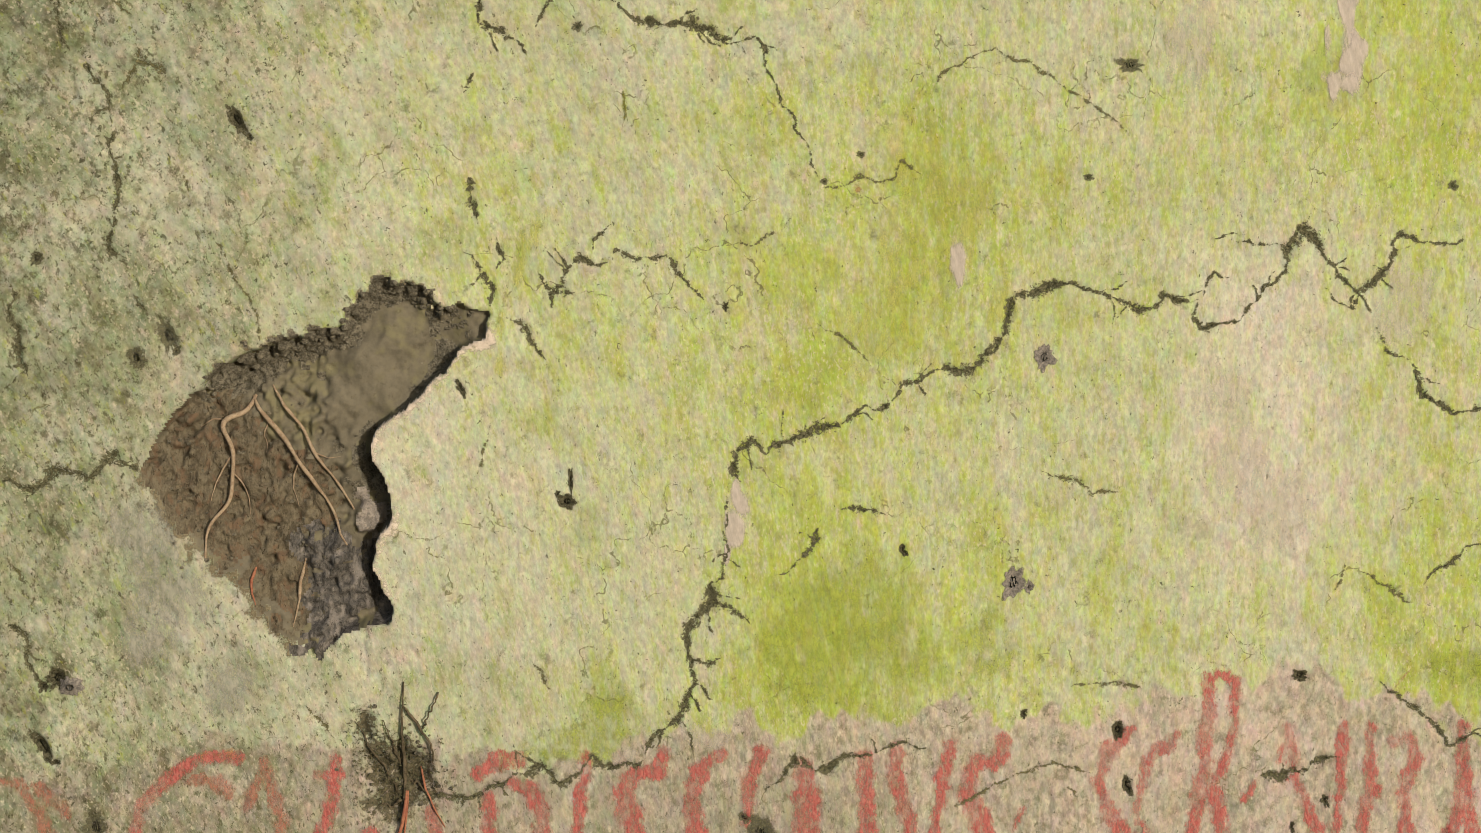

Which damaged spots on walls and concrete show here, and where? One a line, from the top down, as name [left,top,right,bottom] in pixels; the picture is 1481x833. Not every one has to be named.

crack [463,0,553,92]
crack [599,0,921,189]
crack [464,177,704,360]
spalling [111,273,496,662]
crack [434,218,1481,818]